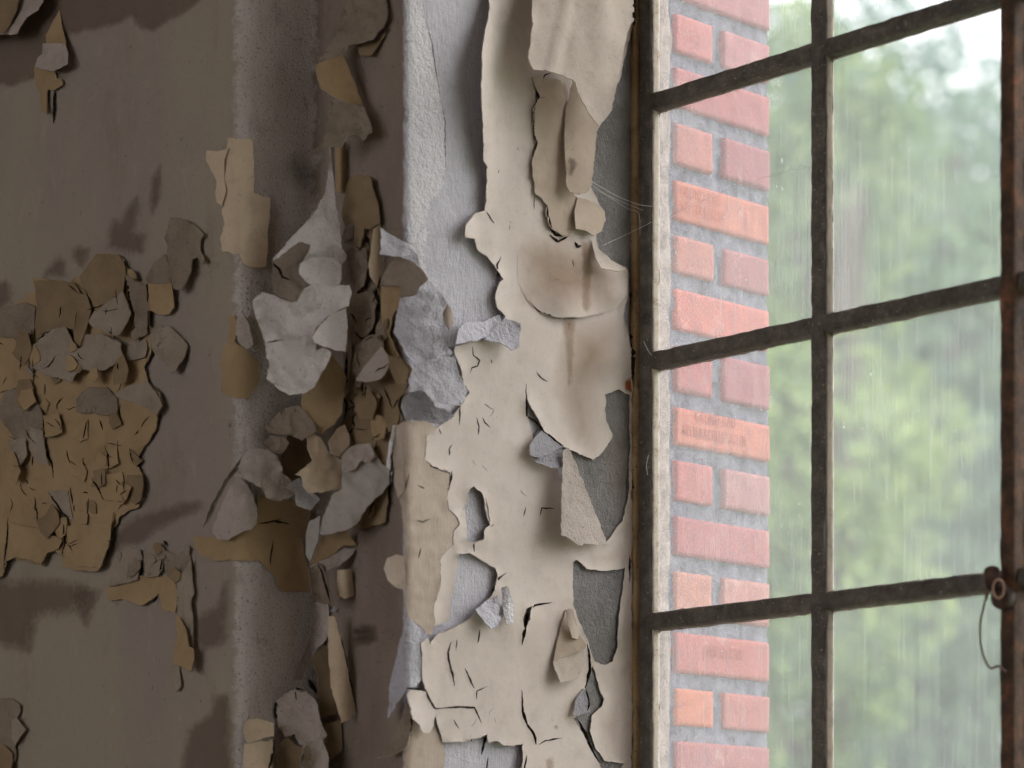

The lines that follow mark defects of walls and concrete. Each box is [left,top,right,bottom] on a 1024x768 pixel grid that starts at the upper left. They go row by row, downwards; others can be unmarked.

peeling [0,0,634,768]
crack [522,602,552,644]
crack [426,630,488,768]